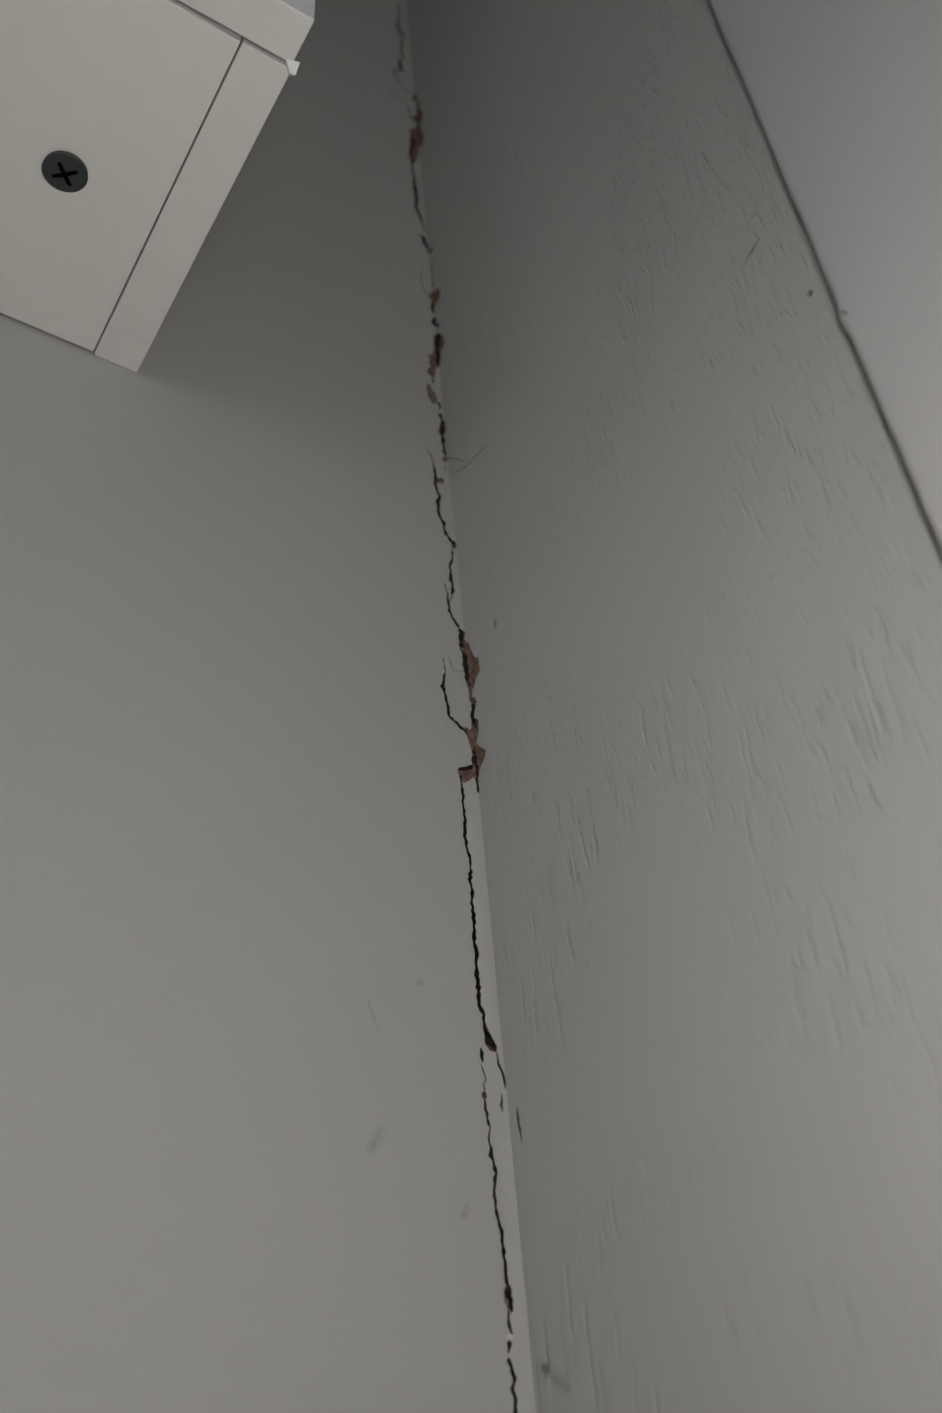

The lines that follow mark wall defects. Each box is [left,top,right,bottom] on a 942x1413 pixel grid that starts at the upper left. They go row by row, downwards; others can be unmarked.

crack [387,5,417,115]
crack [411,165,433,254]
crack [427,446,486,628]
spalling [440,628,486,793]
crack [461,782,522,1413]